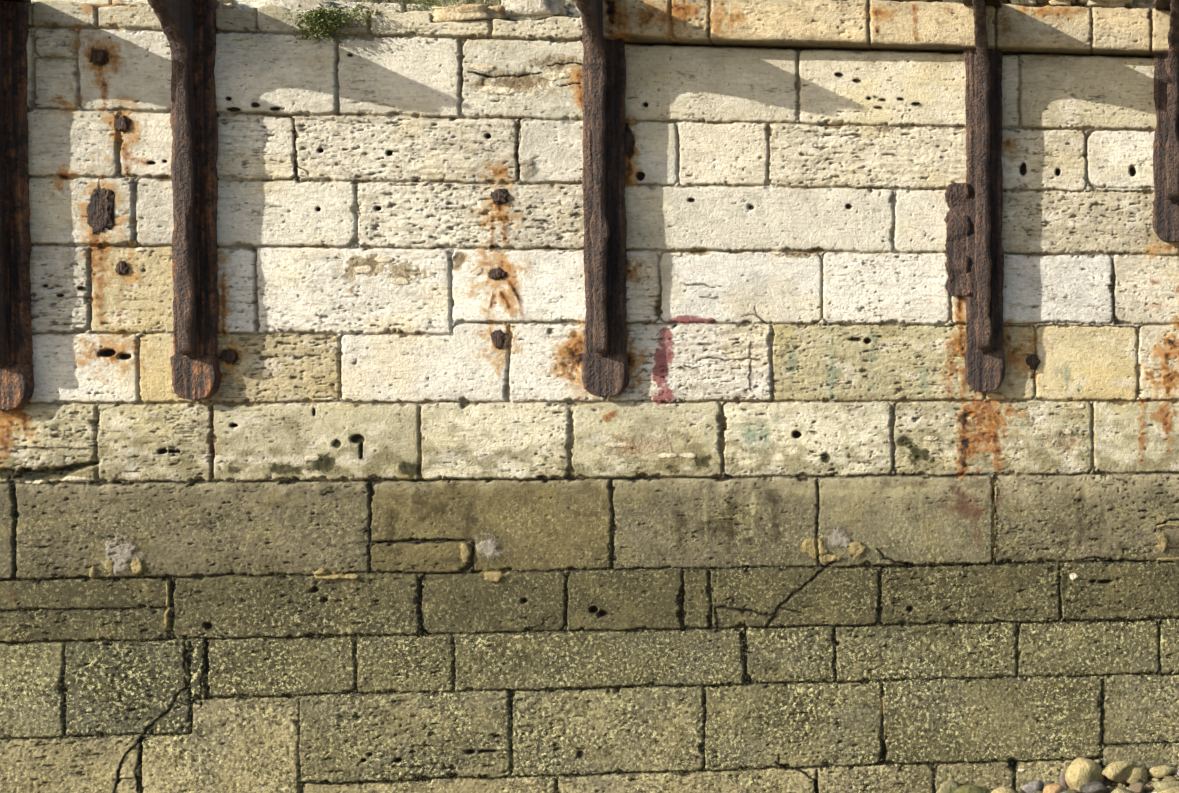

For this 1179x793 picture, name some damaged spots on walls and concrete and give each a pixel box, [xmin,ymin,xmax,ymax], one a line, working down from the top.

rust [911,4,919,40]
rust [73,26,146,175]
rust [55,165,78,190]
rust [0,409,34,460]
rust [77,183,140,372]
rust [470,199,523,374]
rust [552,324,587,400]
rust [627,329,646,388]
rust [946,296,1037,517]
rust [1138,317,1179,464]
crack [714,561,836,629]
crack [113,638,209,793]